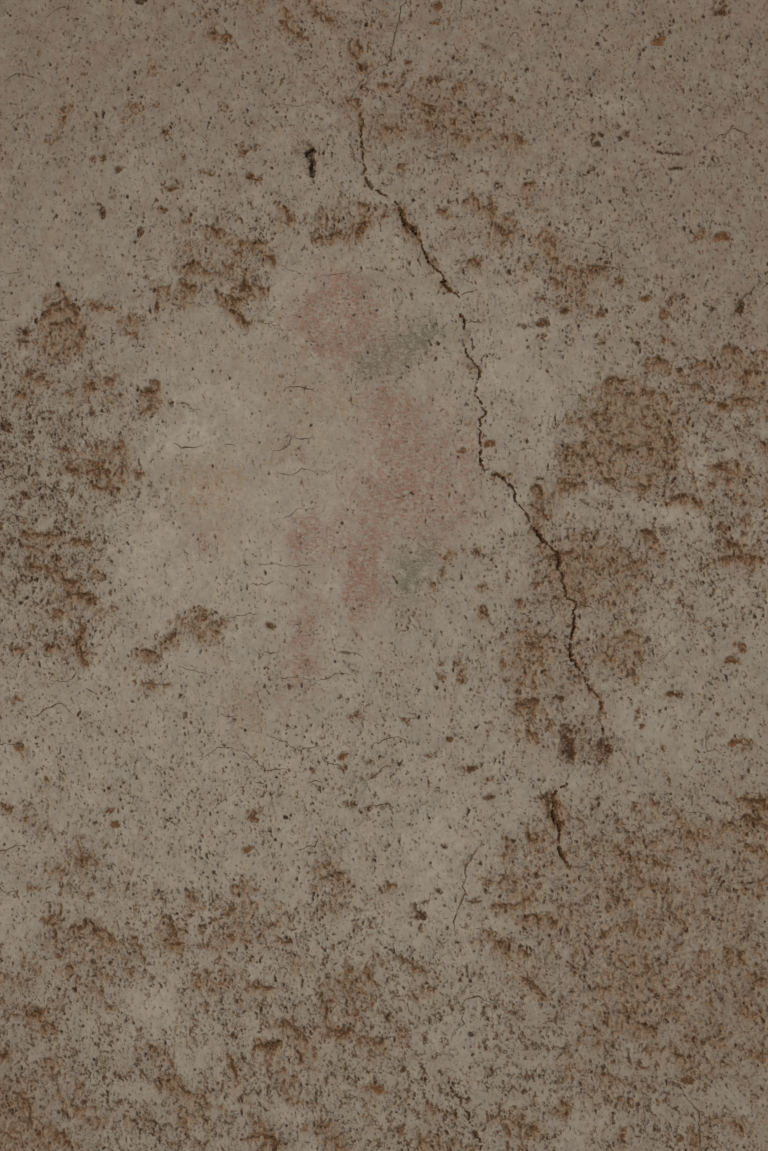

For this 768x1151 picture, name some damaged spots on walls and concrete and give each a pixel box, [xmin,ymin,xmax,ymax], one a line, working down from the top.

crack [572,229,646,270]
flaking render [7,192,376,495]
crack [350,0,608,735]
flaking render [525,294,768,594]
flaking render [0,512,114,681]
flaking render [130,606,236,694]
flaking render [479,598,618,779]
flaking render [558,522,690,692]
peeling [724,641,748,665]
crack [522,782,577,873]
flaking render [0,764,575,1151]
flaking render [459,789,768,1095]